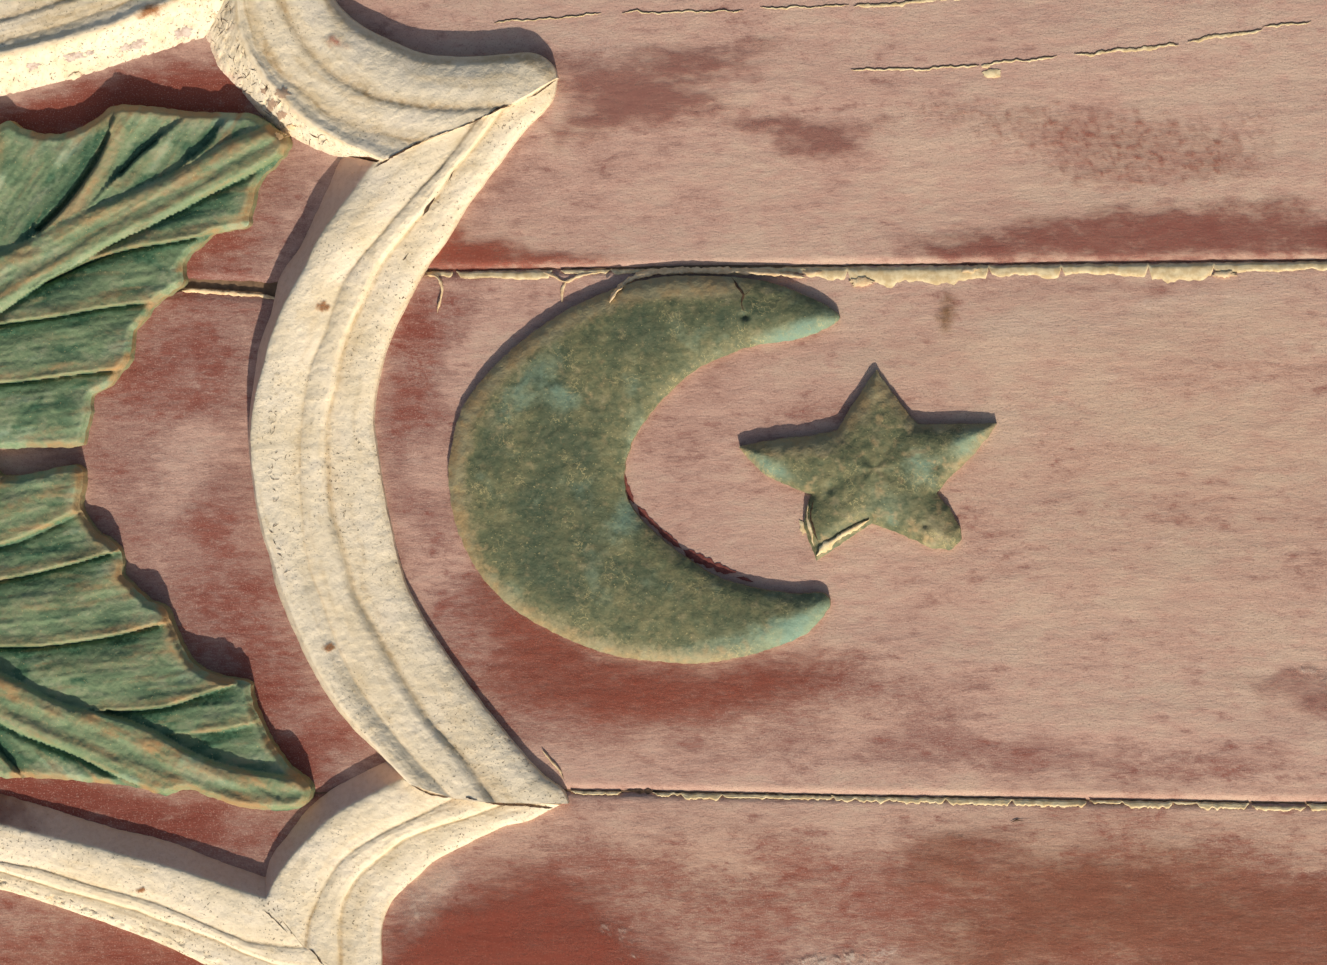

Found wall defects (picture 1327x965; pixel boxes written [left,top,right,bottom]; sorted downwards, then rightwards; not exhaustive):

crack [495,0,959,24]
crack [853,21,1310,78]
peeling [426,268,709,280]
peeling [728,261,1327,288]
peeling [653,792,1327,823]